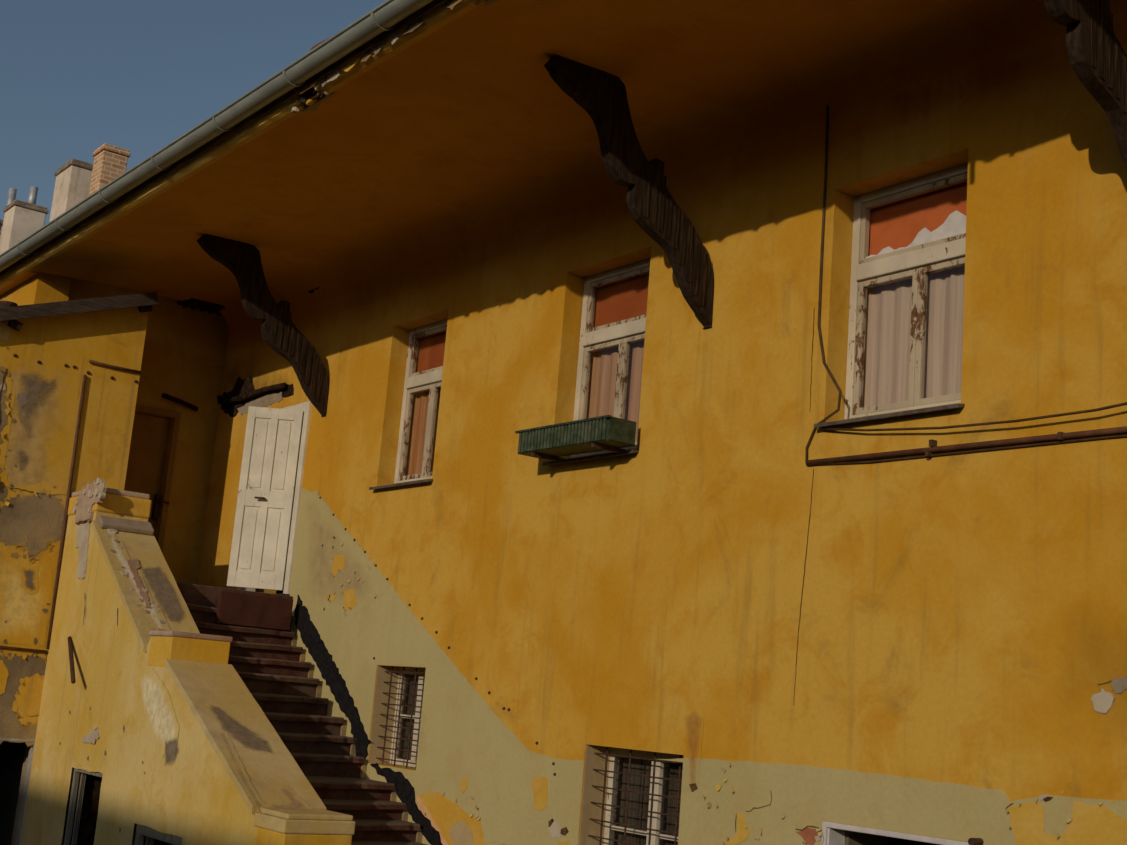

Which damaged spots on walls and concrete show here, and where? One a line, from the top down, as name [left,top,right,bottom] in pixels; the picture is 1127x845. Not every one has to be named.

peeling [0,339,171,746]
peeling [320,536,370,617]
spalling [82,727,107,761]
peeling [137,668,179,757]
spalling [1091,676,1127,713]
peeling [416,775,505,845]
peeling [703,762,772,845]
peeling [795,826,824,845]
peeling [997,790,1127,845]